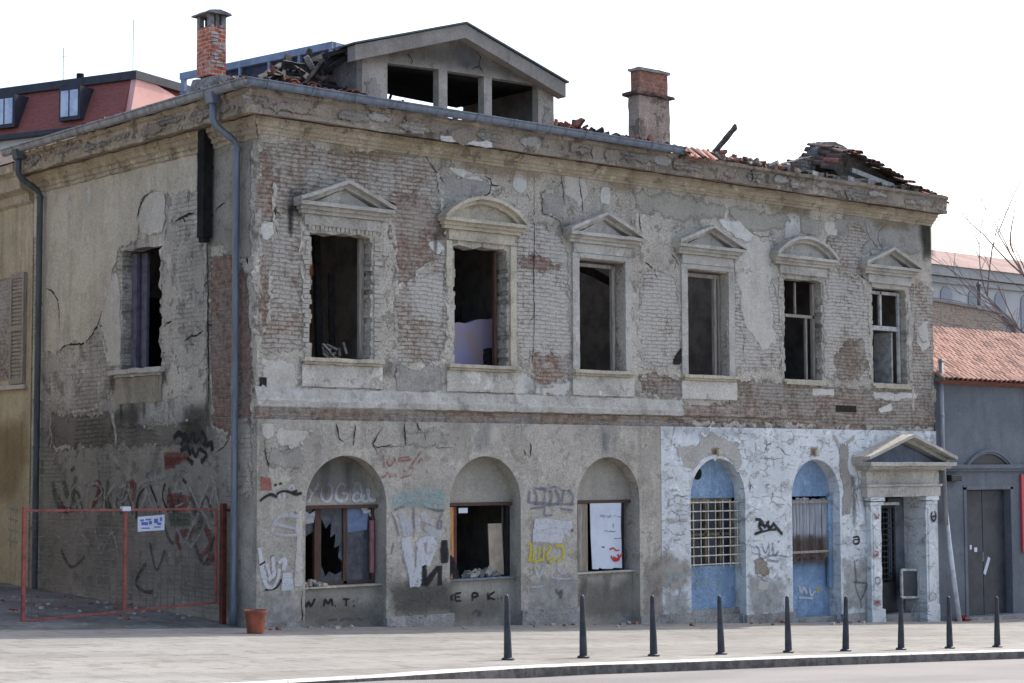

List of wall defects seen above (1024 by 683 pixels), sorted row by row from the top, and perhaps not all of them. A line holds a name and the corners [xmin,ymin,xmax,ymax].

spalling [367,112,493,148]
spalling [520,107,554,148]
peeling [563,176,611,207]
crack [46,288,102,352]
spalling [33,132,490,454]
spalling [508,213,572,396]
crack [530,175,584,378]
spalling [634,263,683,399]
spalling [664,213,937,541]
crack [336,422,453,454]
spalling [645,553,692,614]
spalling [750,549,784,613]